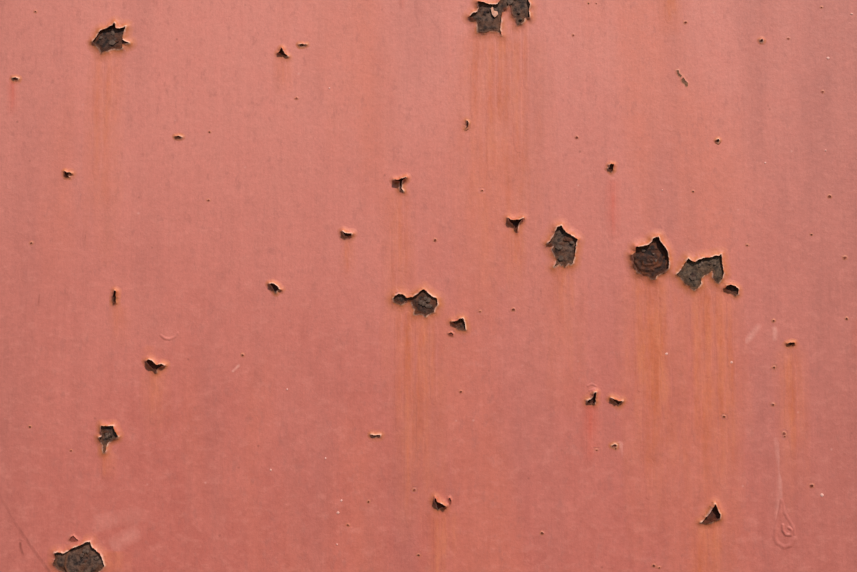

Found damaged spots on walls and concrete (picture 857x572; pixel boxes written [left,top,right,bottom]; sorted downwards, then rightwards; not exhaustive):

peeling [85,15,138,55]
peeling [461,0,538,37]
peeling [544,217,586,269]
peeling [623,228,740,298]
peeling [392,283,441,318]
corrosion [369,22,756,572]
peeling [93,419,125,454]
peeling [698,500,723,525]
peeling [46,533,108,572]